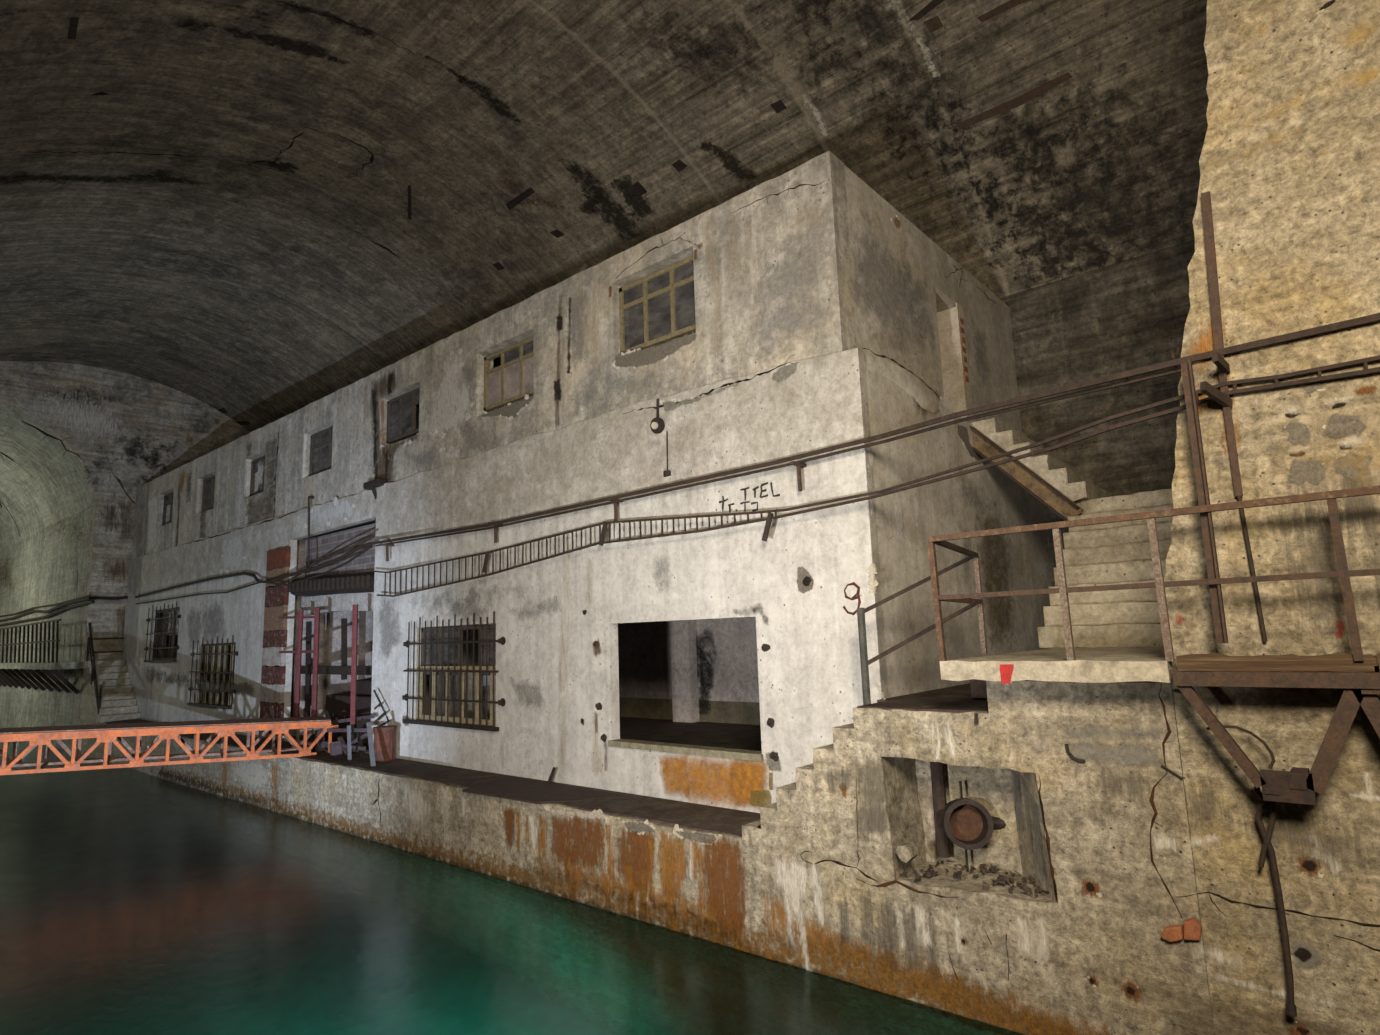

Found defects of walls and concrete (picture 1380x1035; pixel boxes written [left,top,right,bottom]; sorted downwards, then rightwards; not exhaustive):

efflorescence [886,0,937,77]
damp [566,163,654,239]
crack [621,355,798,414]
crack [1147,682,1380,952]
corrosion [159,757,1107,1035]